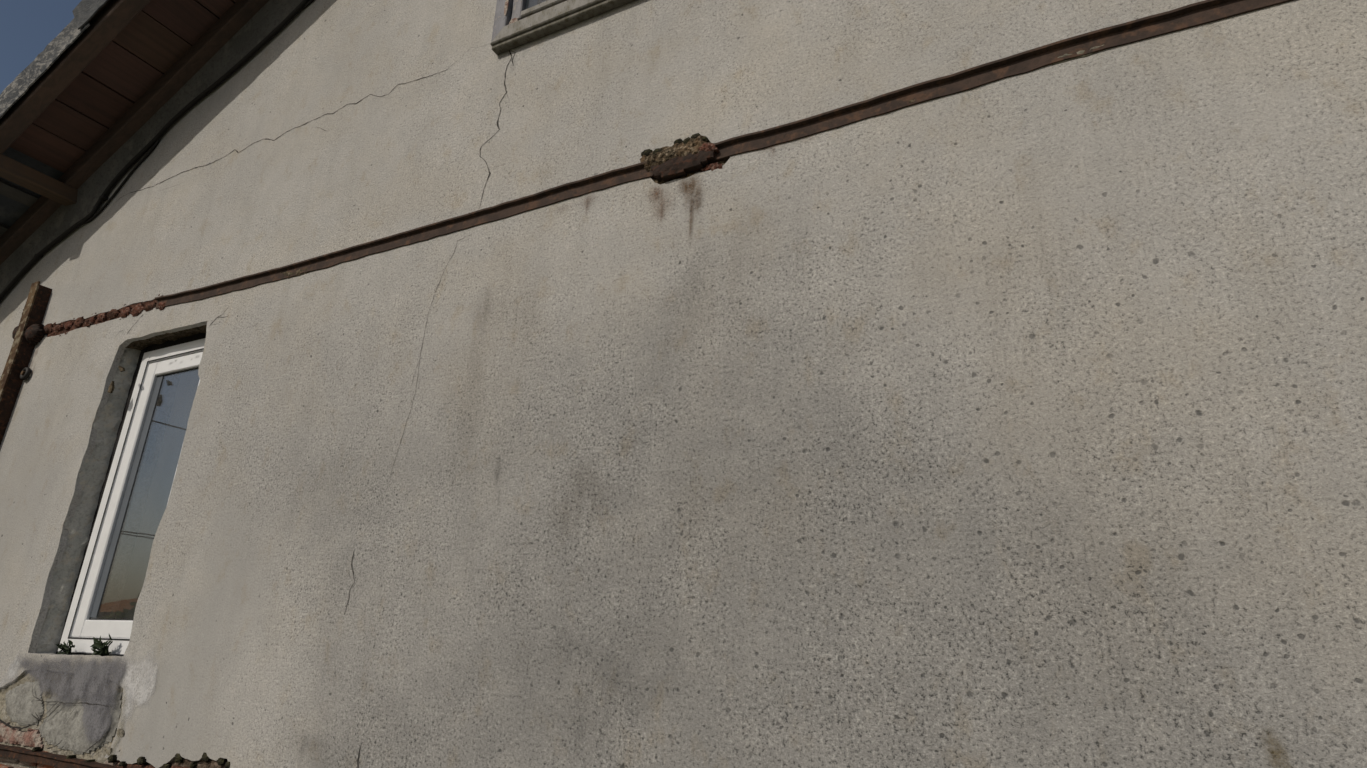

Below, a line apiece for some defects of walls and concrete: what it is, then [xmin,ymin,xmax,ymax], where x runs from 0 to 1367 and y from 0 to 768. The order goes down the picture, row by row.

crack [111,64,453,206]
crack [479,50,515,204]
flaking render [640,133,728,185]
flaking render [0,670,125,764]
flaking render [150,752,230,768]